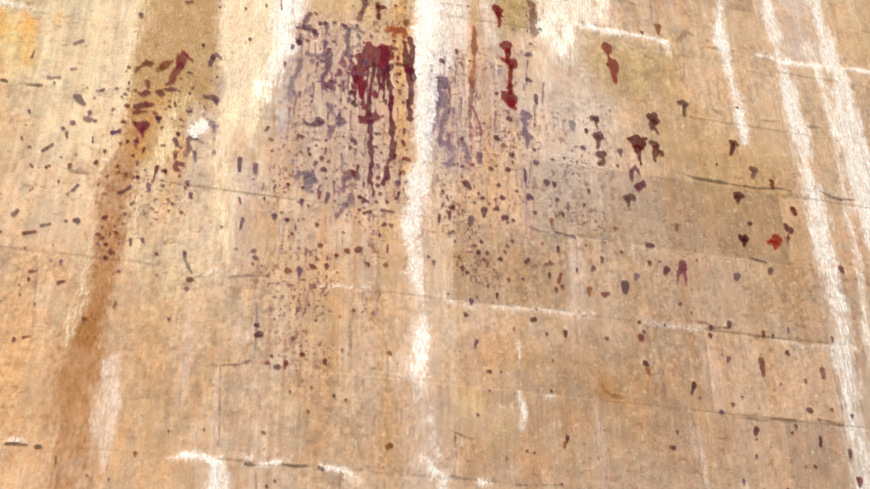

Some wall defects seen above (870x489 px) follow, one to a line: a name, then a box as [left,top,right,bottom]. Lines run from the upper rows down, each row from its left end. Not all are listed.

leakage [601,29,619,83]
leakage [729,106,747,155]
leakage [569,112,664,207]
leakage [43,0,515,432]
leakage [766,223,794,249]